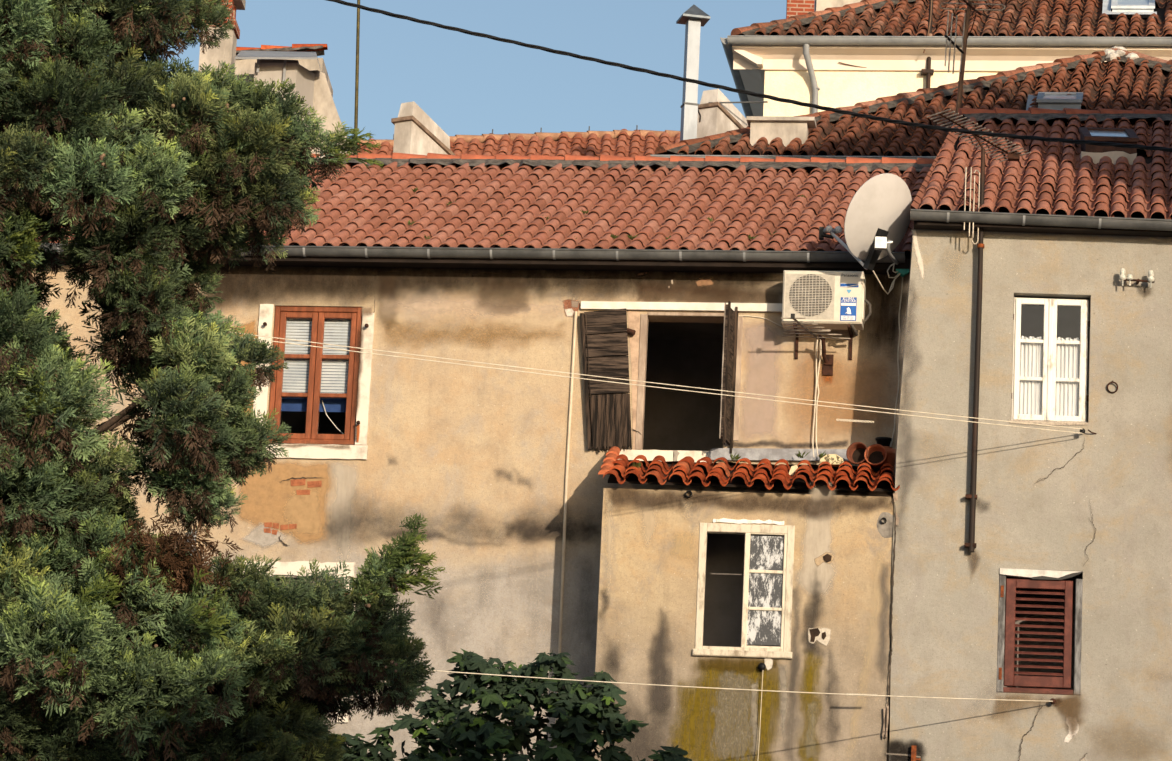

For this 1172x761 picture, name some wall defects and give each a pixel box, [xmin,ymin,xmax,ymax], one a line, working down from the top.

spalling [240,463,329,547]
damp [518,519,612,551]
damp [610,486,886,728]
damp [614,710,661,761]
crack [1018,699,1043,761]